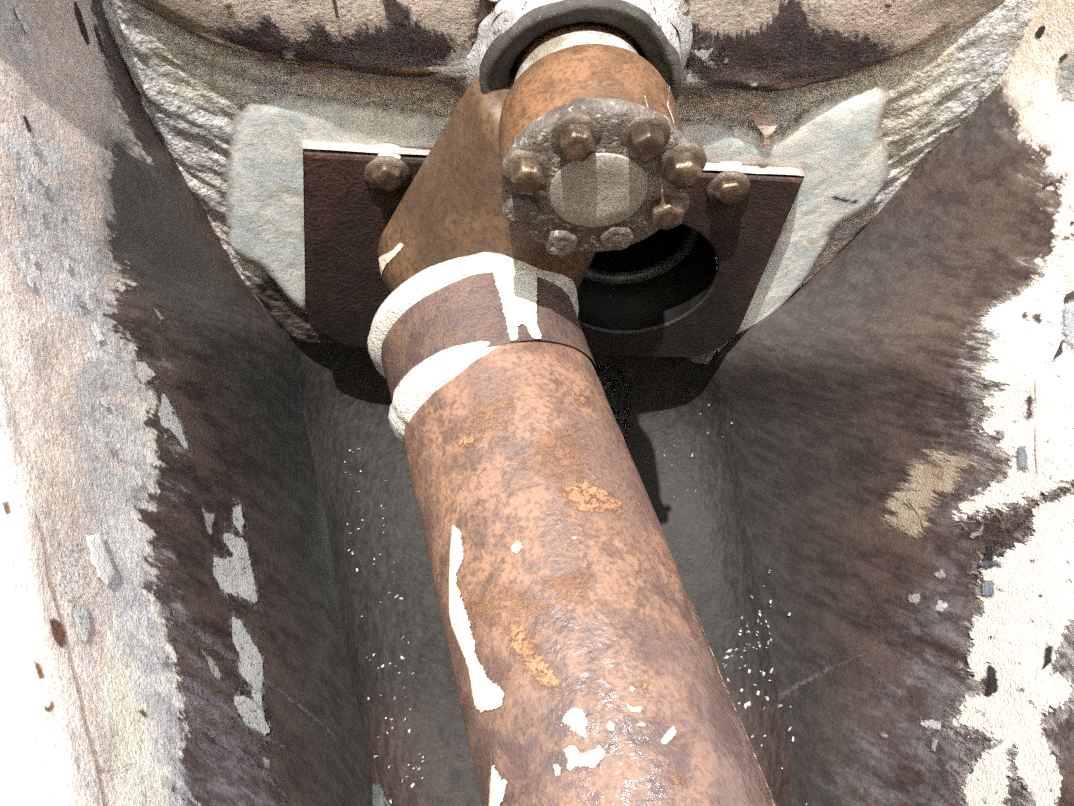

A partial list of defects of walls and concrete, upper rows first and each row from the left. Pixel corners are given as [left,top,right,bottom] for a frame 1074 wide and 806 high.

corrosion [836,19,952,79]
peeling [379,243,403,276]
peeling [135,361,155,384]
peeling [157,394,188,450]
corrosion [560,478,625,515]
peeling [202,505,258,603]
peeling [881,253,1074,806]
peeling [204,653,220,678]
peeling [231,616,270,736]
corrosion [504,619,562,693]
peeling [553,707,605,776]
peeling [661,726,677,744]